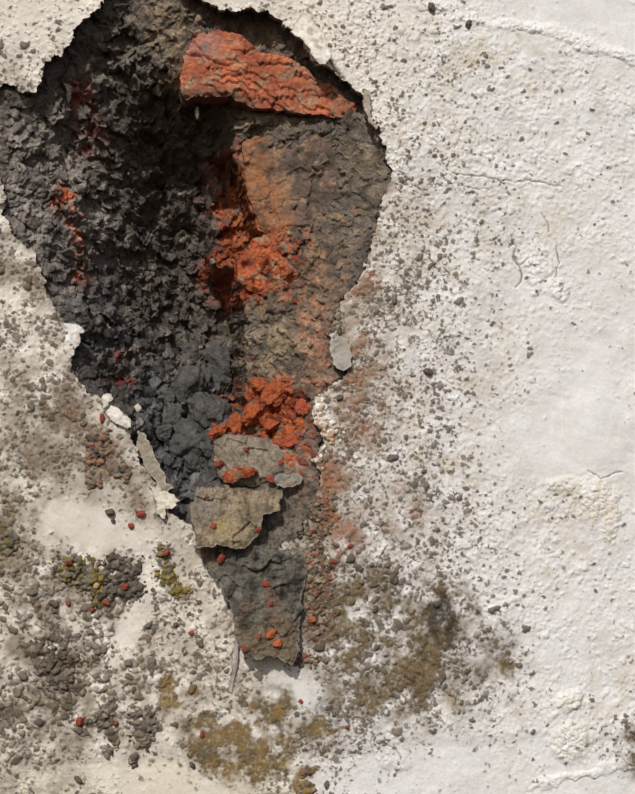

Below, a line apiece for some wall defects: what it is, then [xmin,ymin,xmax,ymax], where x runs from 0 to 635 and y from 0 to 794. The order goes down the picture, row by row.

spalling [0,0,393,692]
damp [316,571,481,717]
damp [480,637,515,676]
damp [292,768,313,794]